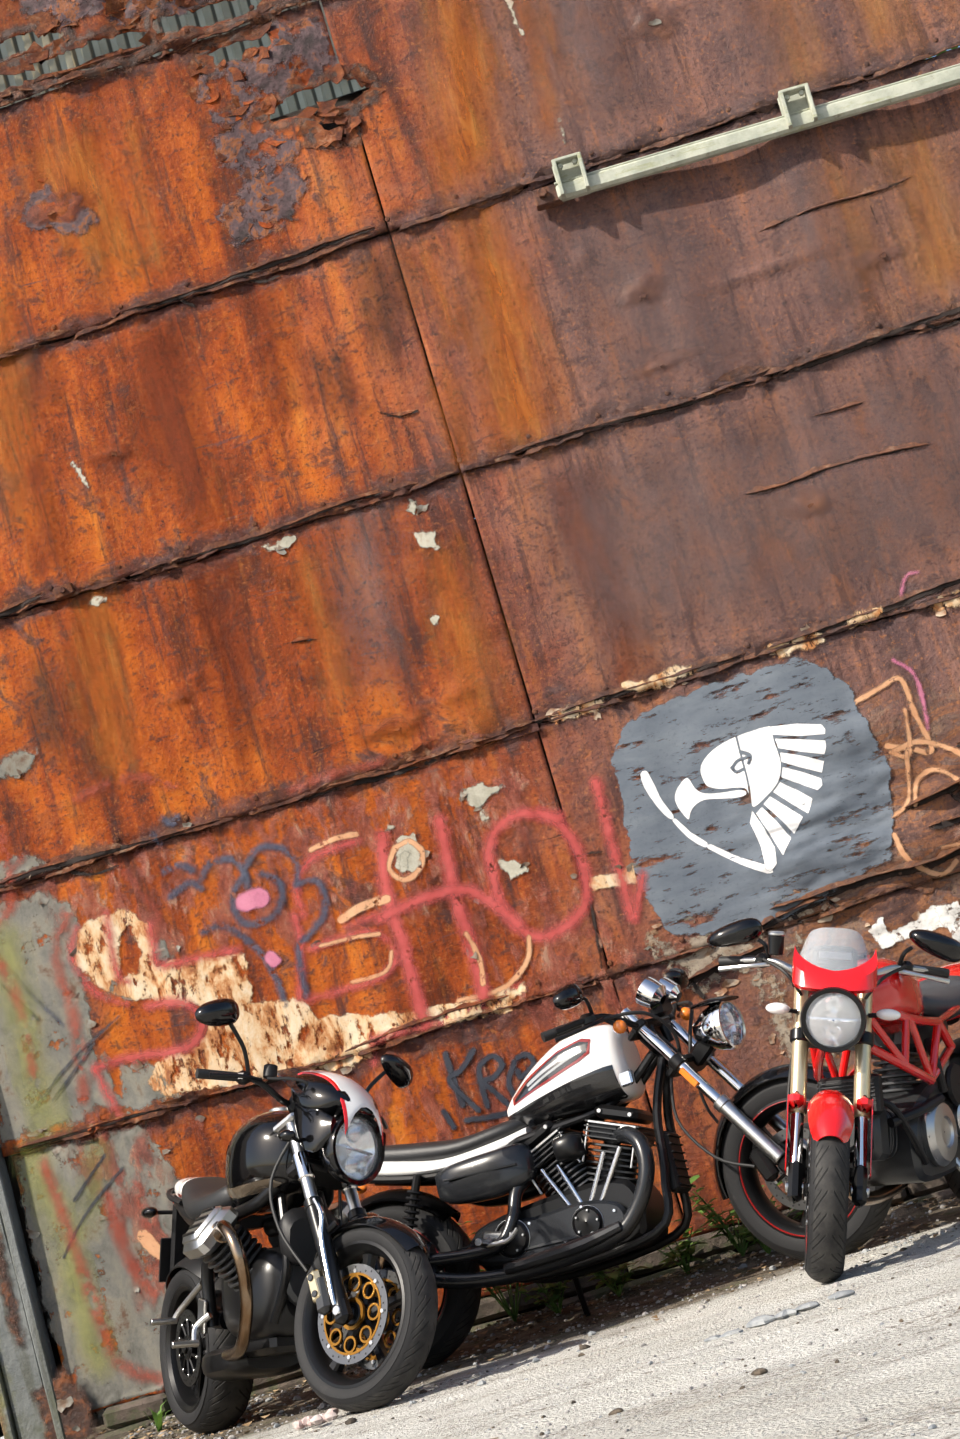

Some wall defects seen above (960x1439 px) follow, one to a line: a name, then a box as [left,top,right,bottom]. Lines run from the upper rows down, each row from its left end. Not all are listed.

rust [0,0,209,101]
rust [186,0,385,248]
rust [20,177,99,236]
crack [758,175,913,232]
crack [743,442,928,495]
peeling [764,624,825,658]
peeling [847,607,882,629]
peeling [933,590,960,617]
peeling [621,665,696,692]
peeling [0,749,38,779]
peeling [865,898,960,949]
peeling [0,761,793,1439]